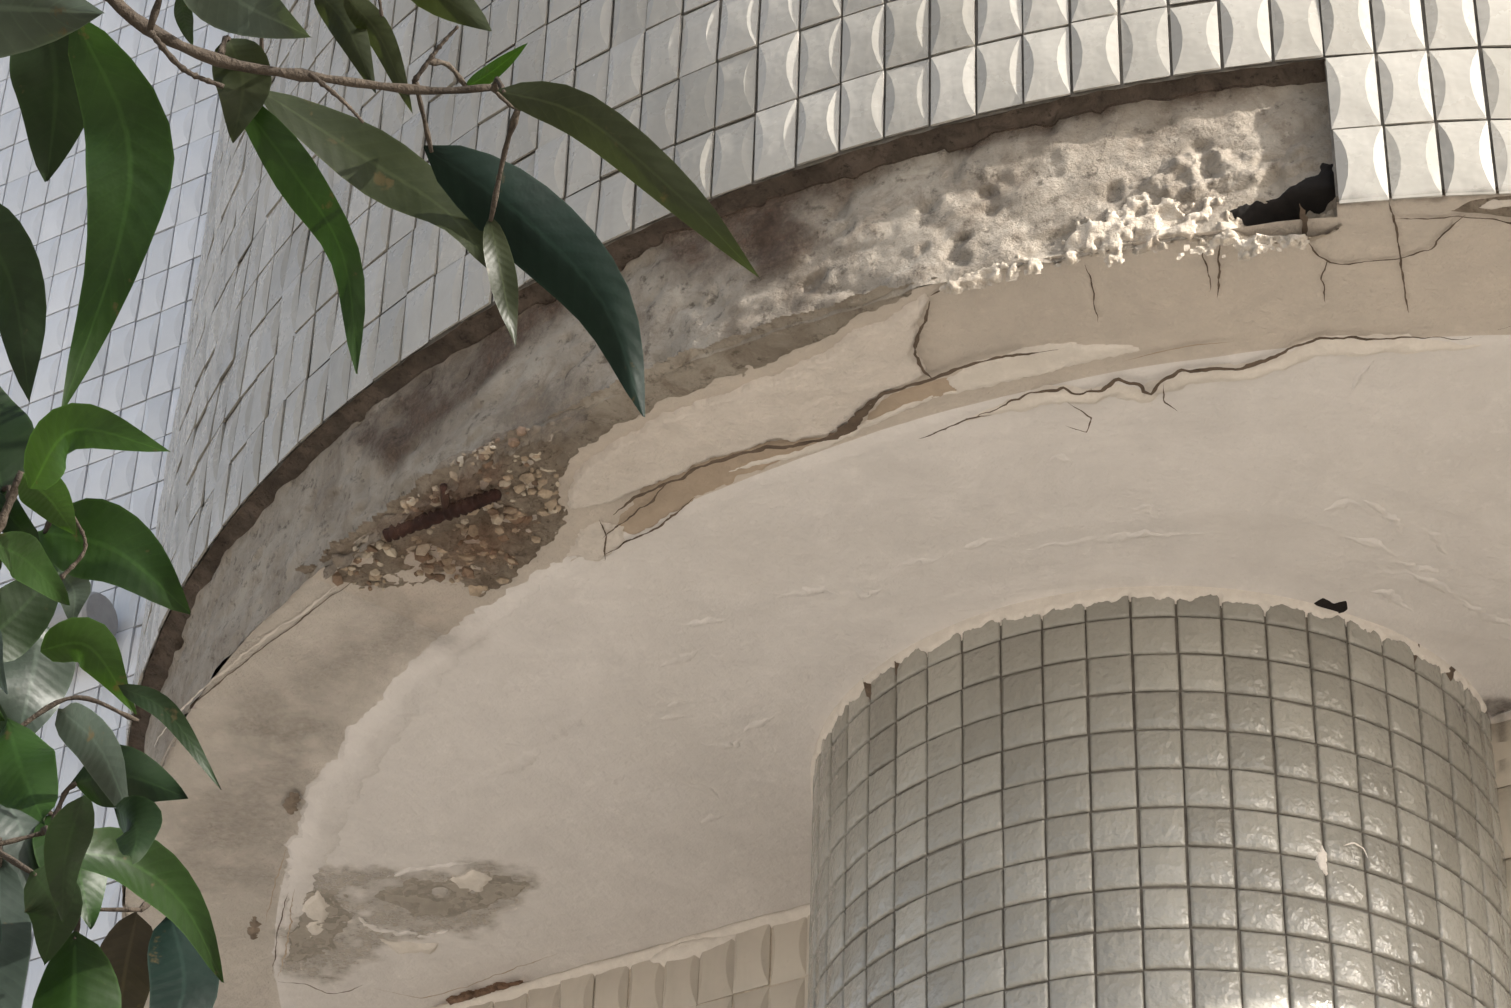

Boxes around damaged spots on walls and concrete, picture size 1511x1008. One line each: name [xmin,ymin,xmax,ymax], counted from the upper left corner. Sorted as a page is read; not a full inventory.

crack [1299,203,1463,313]
flaking render [1449,190,1511,224]
spalling [142,59,1481,714]
crack [599,290,1052,559]
spalling [129,705,177,767]
peeling [278,861,558,998]